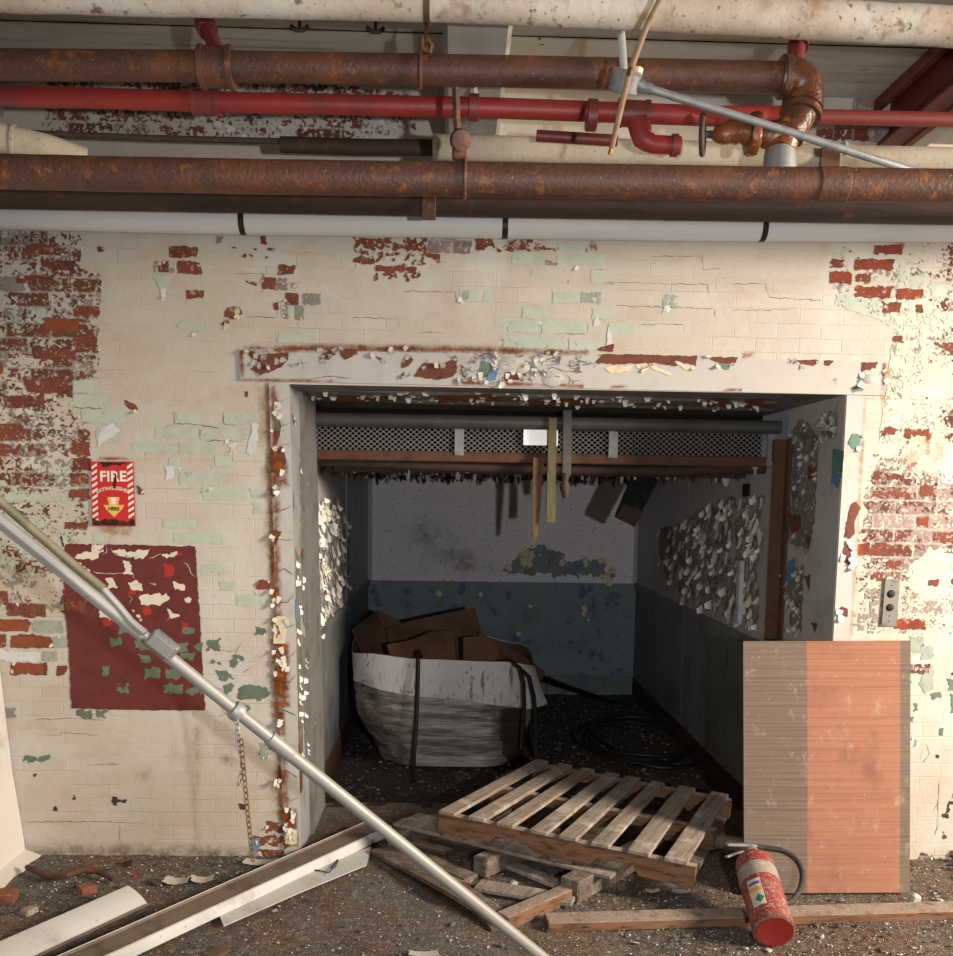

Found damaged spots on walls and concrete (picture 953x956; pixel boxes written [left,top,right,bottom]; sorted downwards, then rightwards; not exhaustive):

flaking render [153,245,204,301]
peeling [244,237,779,412]
peeling [0,231,192,622]
flaking render [0,531,204,696]
peeling [177,446,352,760]
corrosion [260,379,310,735]
peeling [320,466,636,488]
peeling [502,544,616,586]
peeling [651,474,766,631]
peeling [779,407,866,638]
peeling [830,242,953,713]
corrosion [276,756,298,846]